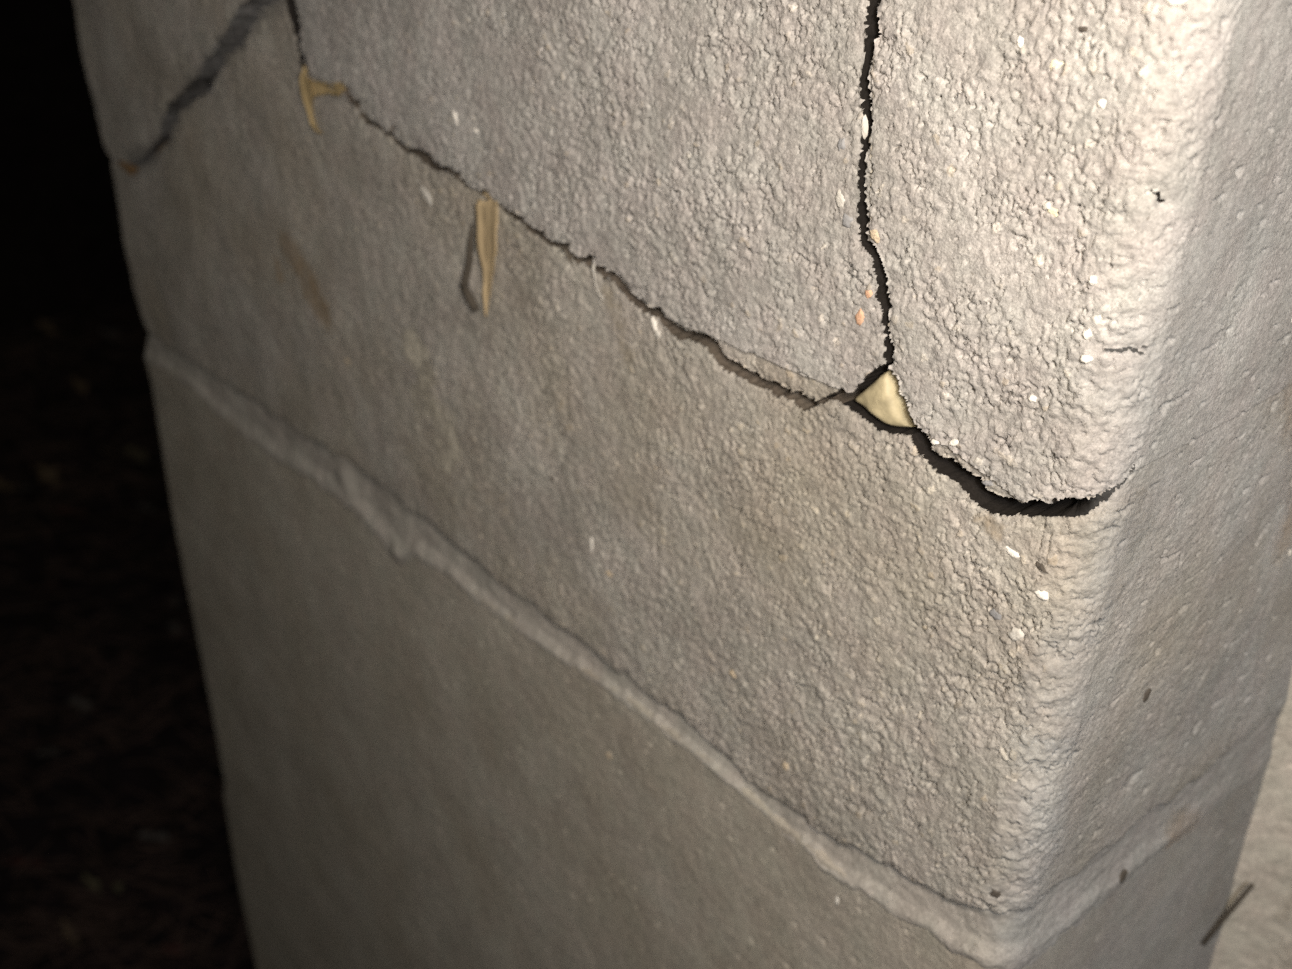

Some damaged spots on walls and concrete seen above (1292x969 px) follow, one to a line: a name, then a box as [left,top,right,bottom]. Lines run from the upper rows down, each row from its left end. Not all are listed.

crack [285,0,309,73]
crack [341,0,1135,518]